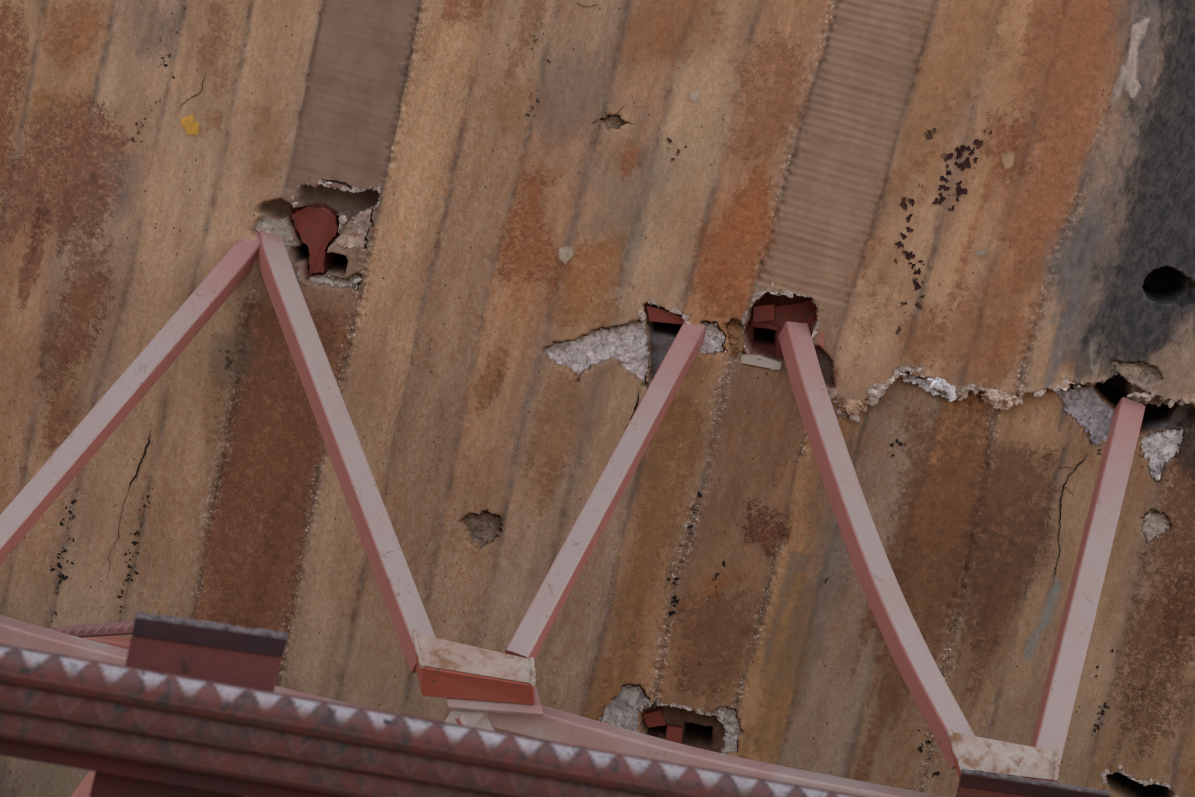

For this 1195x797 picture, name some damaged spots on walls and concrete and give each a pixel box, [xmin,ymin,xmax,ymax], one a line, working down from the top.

corrosion [0,5,129,455]
spalling [253,179,381,249]
corrosion [685,33,807,334]
spalling [297,267,362,289]
spalling [545,282,819,386]
spalling [829,335,1191,446]
spalling [1139,427,1188,481]
spalling [462,512,501,547]
crack [1038,453,1087,591]
spalling [598,685,742,754]
spalling [1101,765,1178,797]